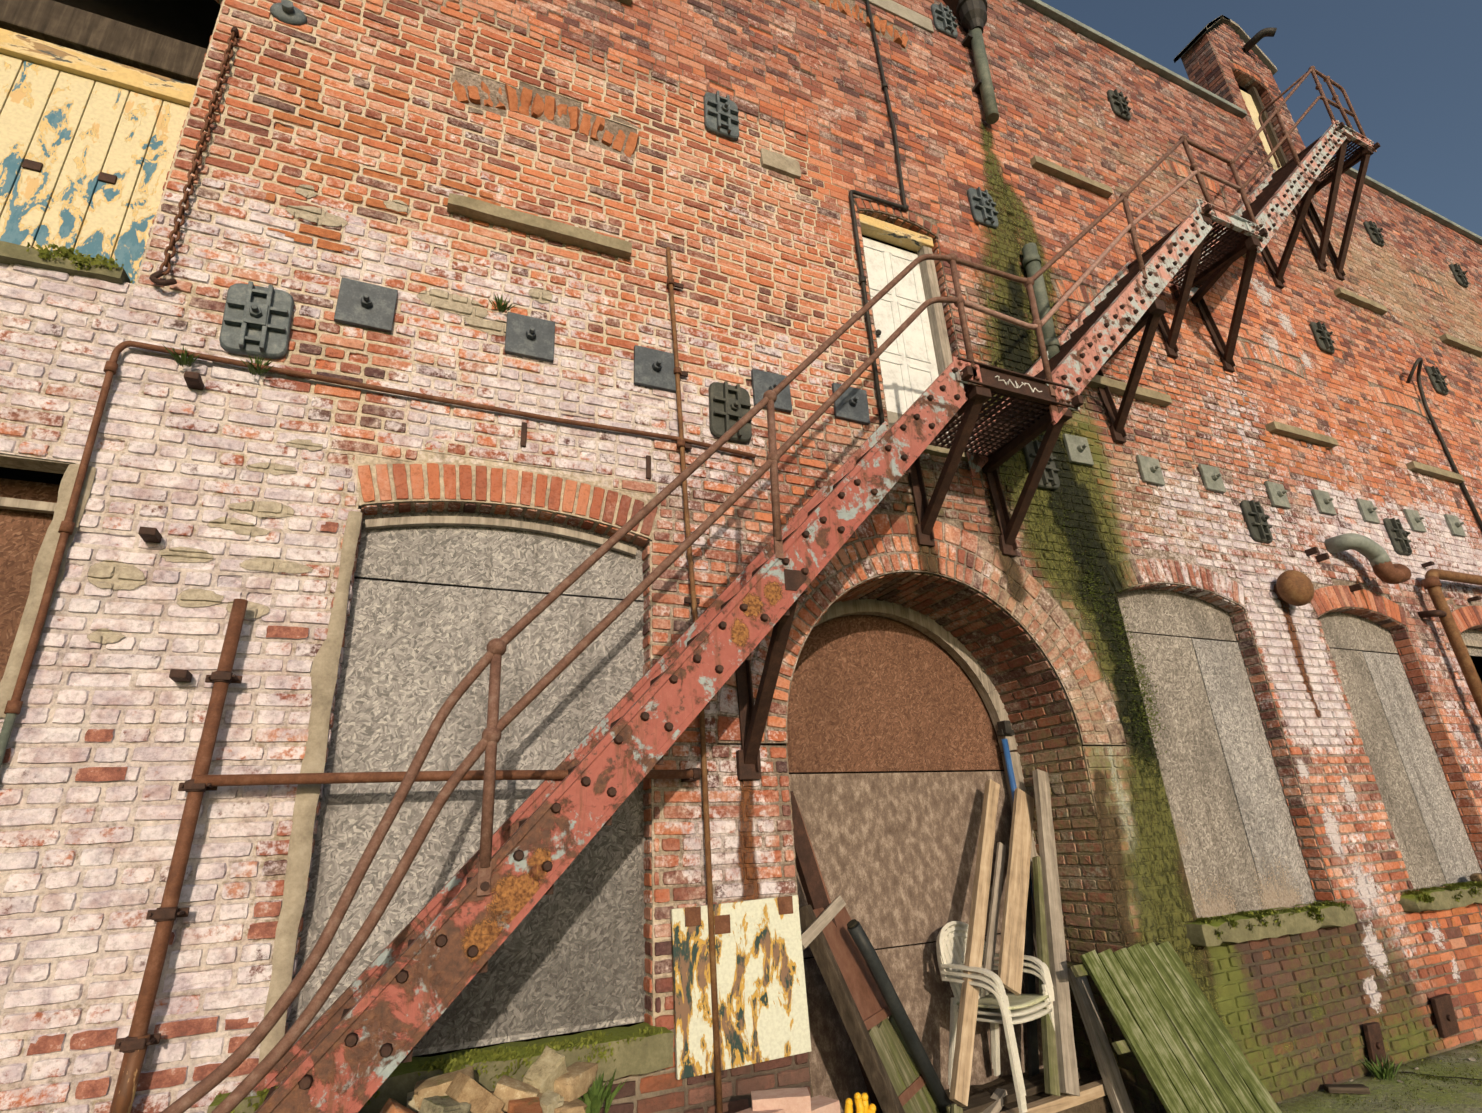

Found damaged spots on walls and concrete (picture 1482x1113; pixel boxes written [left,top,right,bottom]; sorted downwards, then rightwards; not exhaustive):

water stain [979,123,1061,374]
water stain [907,476,941,577]
corrosion [731,582,782,647]
water stain [987,429,1160,774]
corrosion [462,848,552,963]
corrosion [685,907,731,935]
corrosion [737,780,793,915]
corrosion [813,906,887,1021]
water stain [1094,770,1138,948]
water stain [1175,846,1197,923]